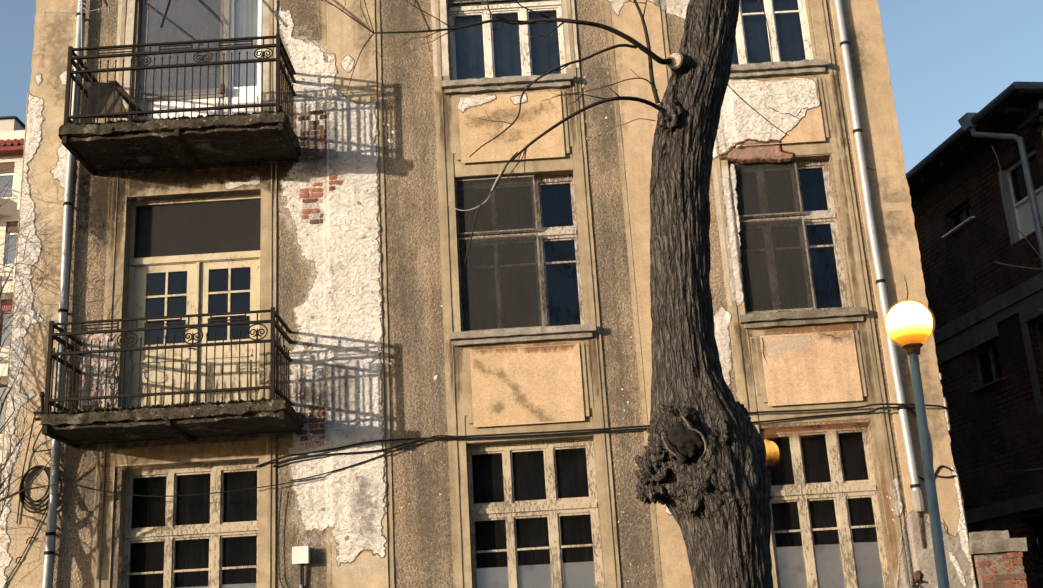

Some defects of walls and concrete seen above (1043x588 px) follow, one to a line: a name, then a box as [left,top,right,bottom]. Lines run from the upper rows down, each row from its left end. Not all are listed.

flaking render [606,0,632,16]
flaking render [647,0,690,21]
flaking render [456,93,528,113]
flaking render [0,73,46,588]
damp [81,134,340,256]
damp [293,365,349,415]
flaking render [273,6,397,567]
flaking render [713,76,821,386]
flaking render [887,466,978,588]